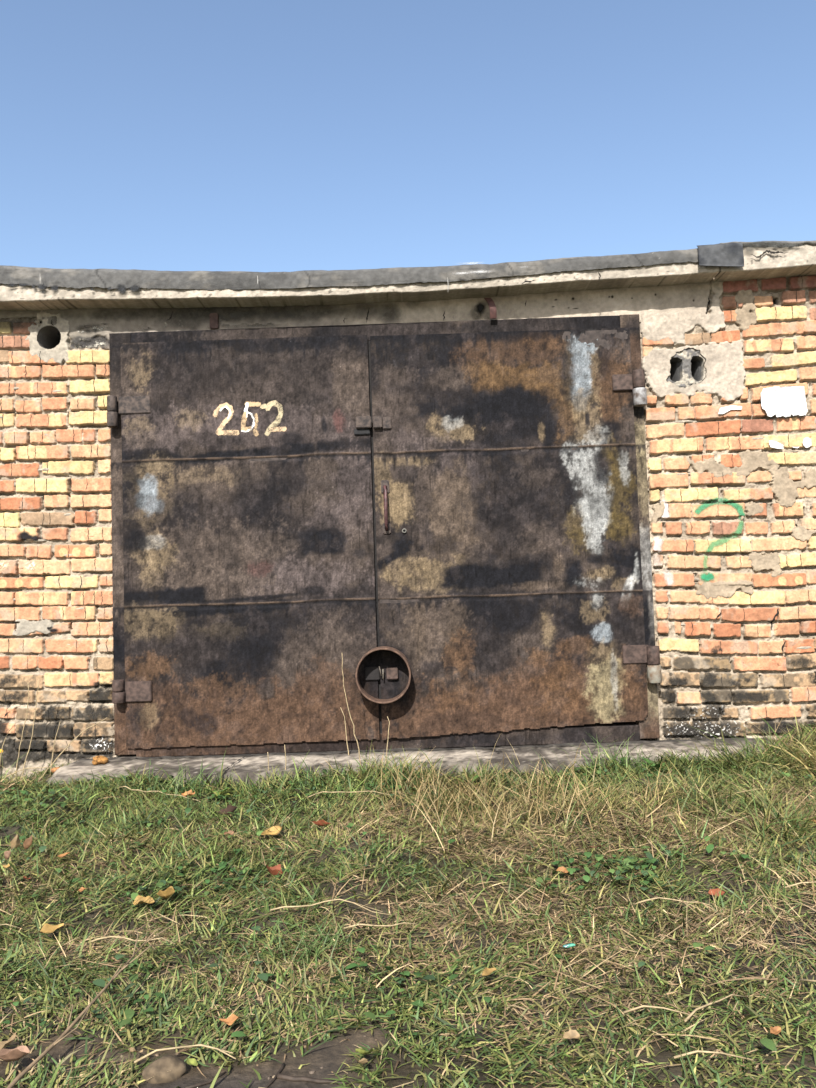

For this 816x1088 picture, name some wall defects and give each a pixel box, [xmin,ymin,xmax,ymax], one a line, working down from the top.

leakage [792,659,816,683]
leakage [0,677,115,768]
leakage [662,672,816,740]